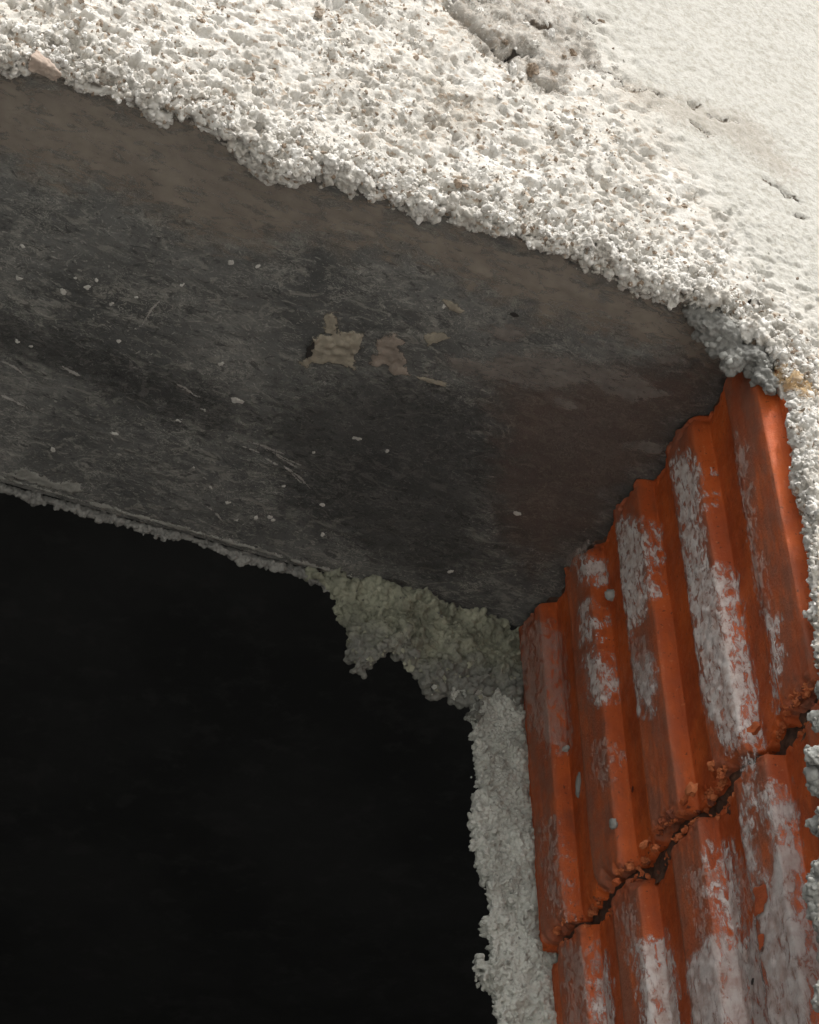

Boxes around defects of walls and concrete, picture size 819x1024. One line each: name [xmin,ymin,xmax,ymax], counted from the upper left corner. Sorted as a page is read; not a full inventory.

peeling [298,313,451,387]
leakage [574,516,664,647]
leakage [577,598,620,709]
leakage [622,440,819,1024]
crack [552,679,819,950]
spalling [753,884,768,916]